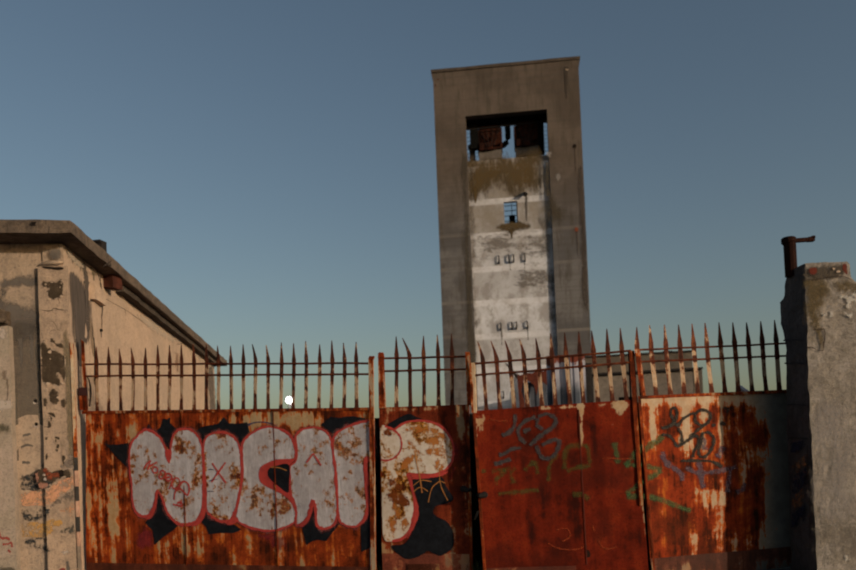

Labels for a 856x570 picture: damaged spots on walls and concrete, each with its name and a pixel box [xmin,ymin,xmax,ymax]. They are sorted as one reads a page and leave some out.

damp [0,276,43,431]
damp [17,433,44,479]
spalling [42,279,64,300]
spalling [33,338,74,489]
damp [461,157,560,363]